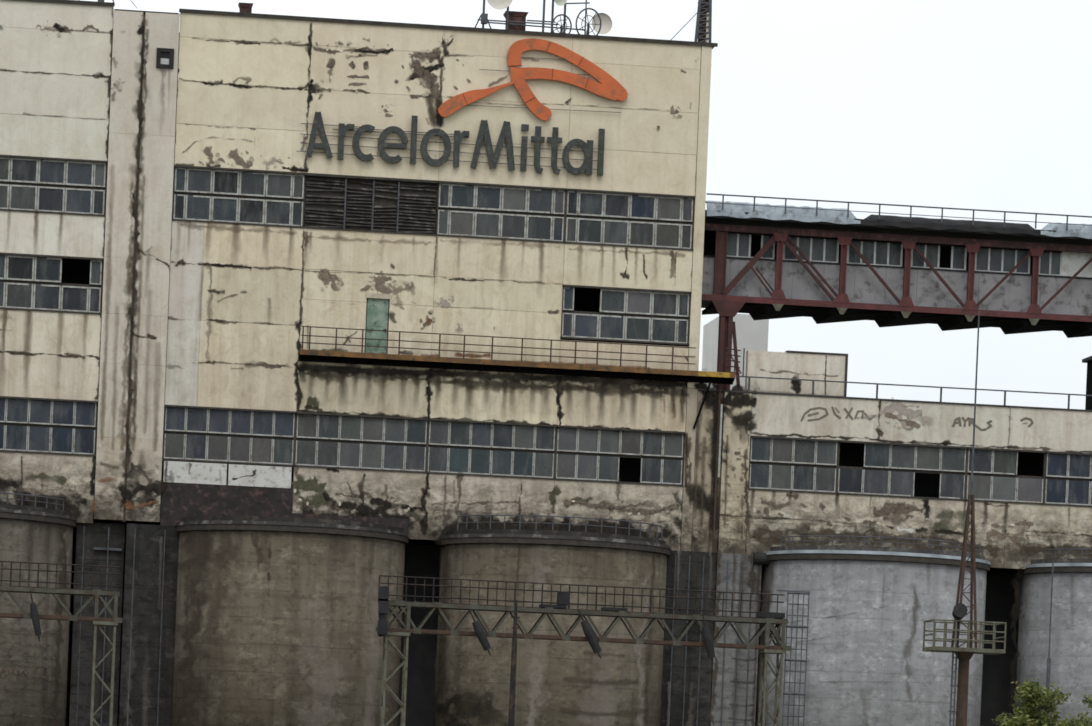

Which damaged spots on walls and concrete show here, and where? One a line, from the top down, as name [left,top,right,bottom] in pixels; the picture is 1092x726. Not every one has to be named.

spalling [308,41,393,99]
spalling [395,37,470,127]
crack [0,12,398,472]
peeling [318,269,342,290]
peeling [361,264,415,323]
water stain [298,350,688,405]
peeling [884,401,927,431]
crack [89,454,97,495]
water stain [674,391,728,542]
water stain [753,528,890,545]
water stain [908,529,981,549]
water stain [1026,539,1092,553]